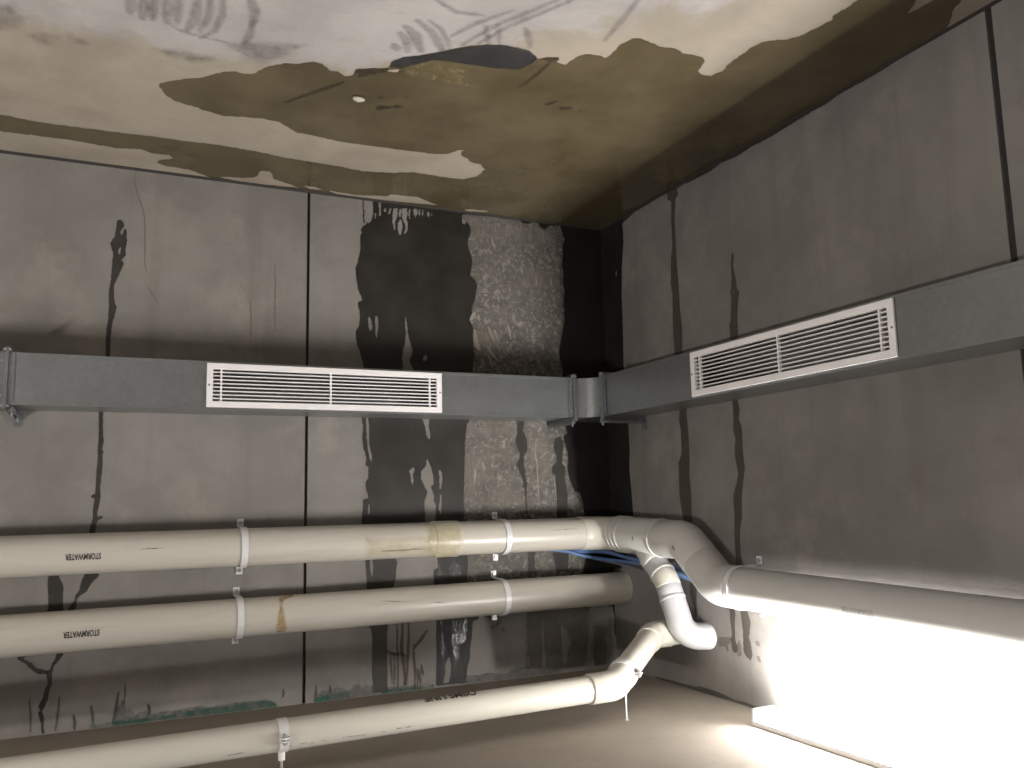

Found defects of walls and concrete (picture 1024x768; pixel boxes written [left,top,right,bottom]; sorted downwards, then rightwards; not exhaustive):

water stain [666,64,891,355]
water stain [105,220,127,356]
water stain [355,200,652,378]
water stain [90,412,104,533]
water stain [362,418,633,524]
water stain [678,409,692,523]
water stain [732,400,745,565]
water stain [46,573,99,612]
water stain [365,559,397,589]
water stain [730,608,752,660]
water stain [18,653,63,734]